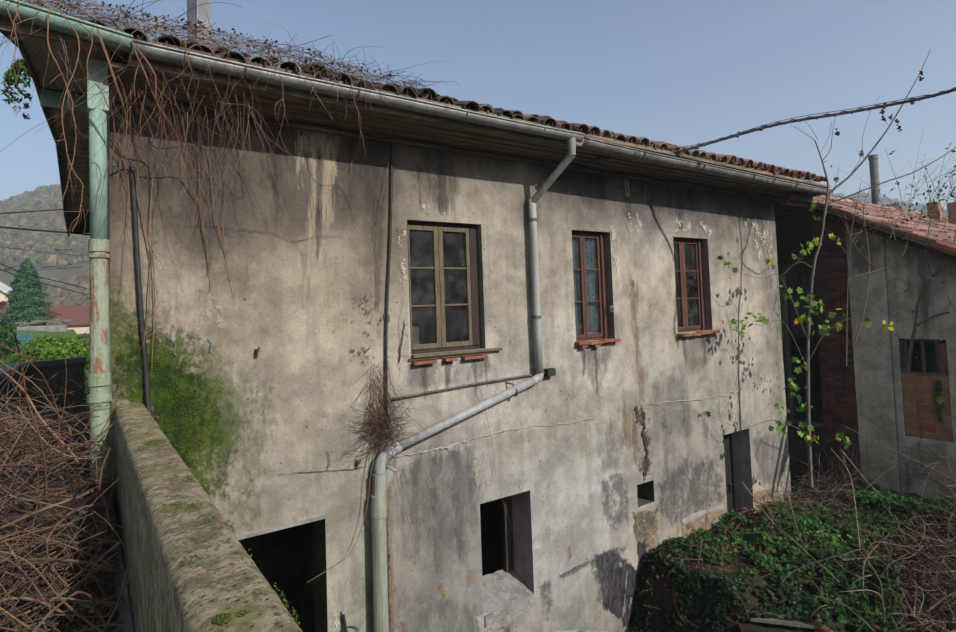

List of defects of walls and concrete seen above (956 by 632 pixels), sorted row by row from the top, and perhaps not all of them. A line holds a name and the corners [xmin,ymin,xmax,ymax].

water stain [295,131,337,308]
crack [395,418,594,457]
crack [635,376,780,482]
flaking render [559,547,622,578]
water stain [592,549,641,627]
flaking render [633,503,727,570]